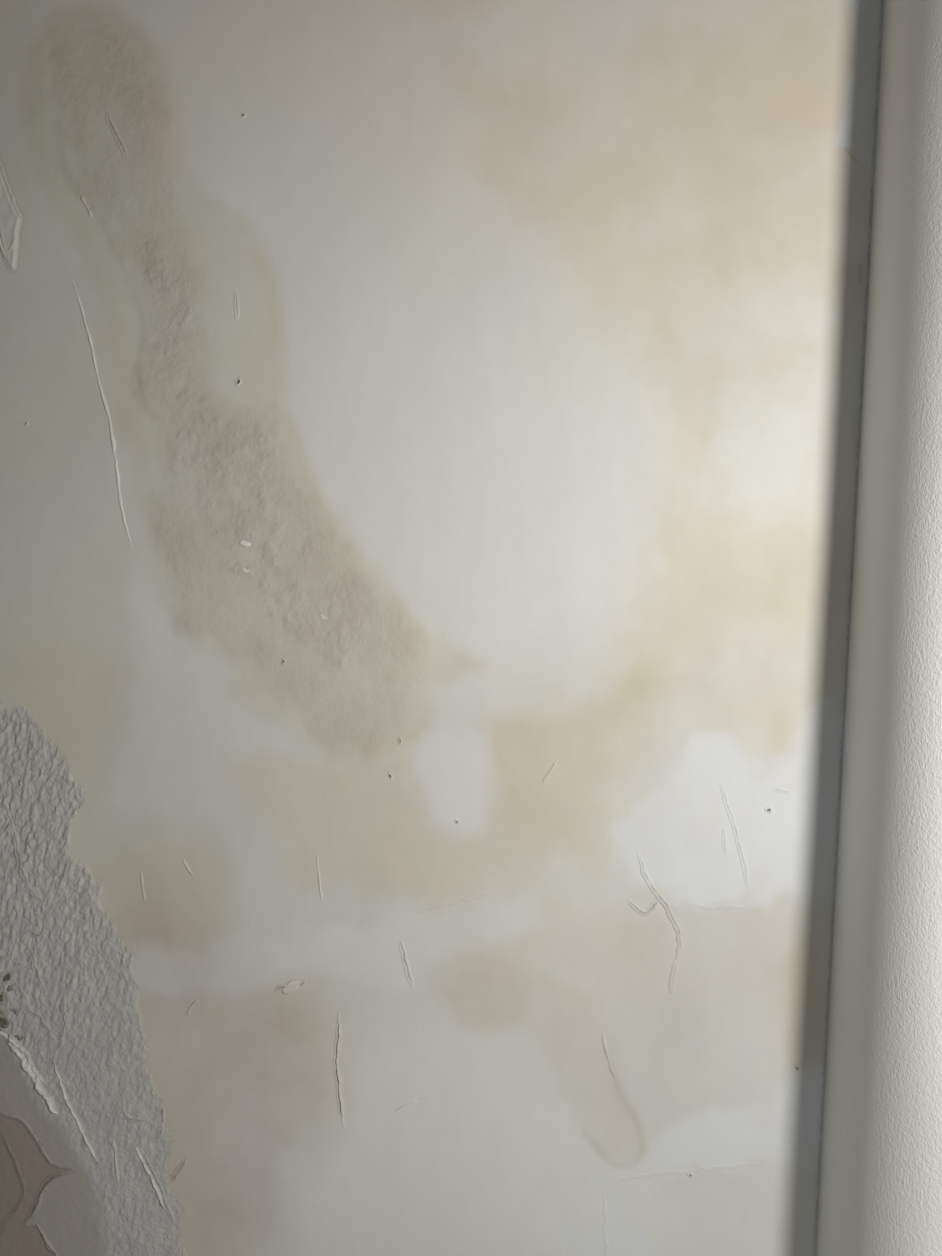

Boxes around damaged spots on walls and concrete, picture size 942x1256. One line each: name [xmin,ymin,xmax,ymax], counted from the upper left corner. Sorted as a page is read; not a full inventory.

peeling [828,0,879,178]
leakage [0,0,495,945]
leakage [210,0,870,1170]
flaking render [0,701,186,1256]
leakage [140,979,364,1256]